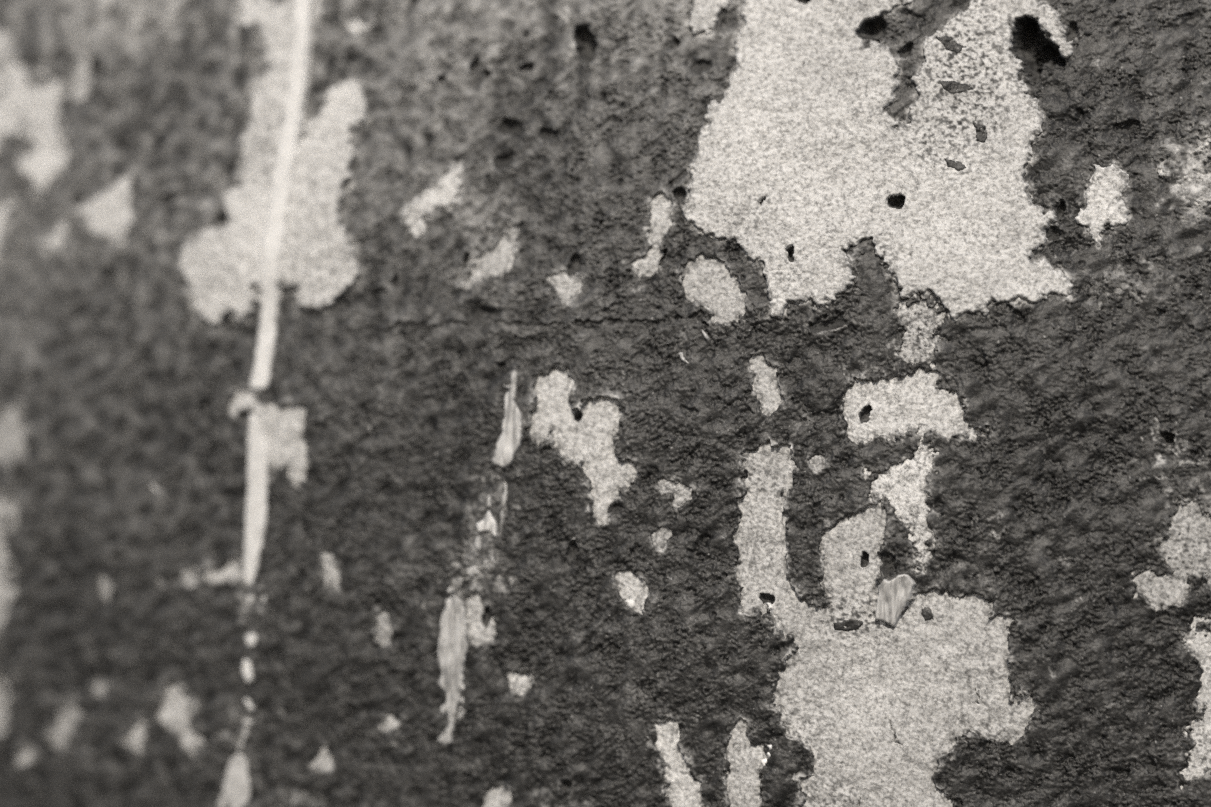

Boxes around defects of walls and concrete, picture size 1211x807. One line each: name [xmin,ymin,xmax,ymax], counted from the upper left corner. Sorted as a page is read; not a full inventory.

peeling [346,20,369,38]
peeling [0,31,104,200]
peeling [179,0,295,326]
peeling [278,79,369,311]
peeling [0,403,30,478]
peeling [228,388,309,485]
peeling [631,0,1131,807]
peeling [0,488,24,639]
peeling [436,362,643,749]
peeling [615,571,649,615]
peeling [1131,496,1211,612]
peeling [1178,616,1211,790]